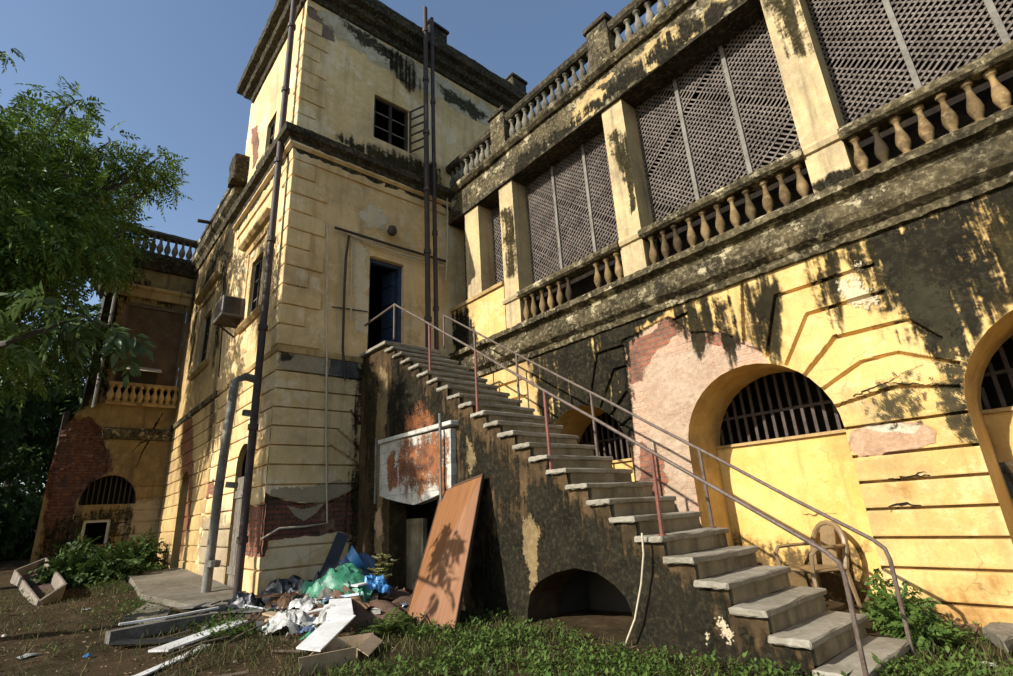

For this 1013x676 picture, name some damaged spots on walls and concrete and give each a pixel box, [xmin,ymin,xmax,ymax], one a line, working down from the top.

damp [316,10,494,126]
damp [514,0,743,173]
damp [764,0,812,57]
flaking render [251,126,259,169]
damp [805,184,1013,446]
crack [134,413,163,465]
flaking render [245,492,358,557]
rust [387,401,449,502]
damp [344,358,812,676]
flaking render [624,316,768,524]
flaking render [848,421,936,458]
flaking render [999,459,1013,498]